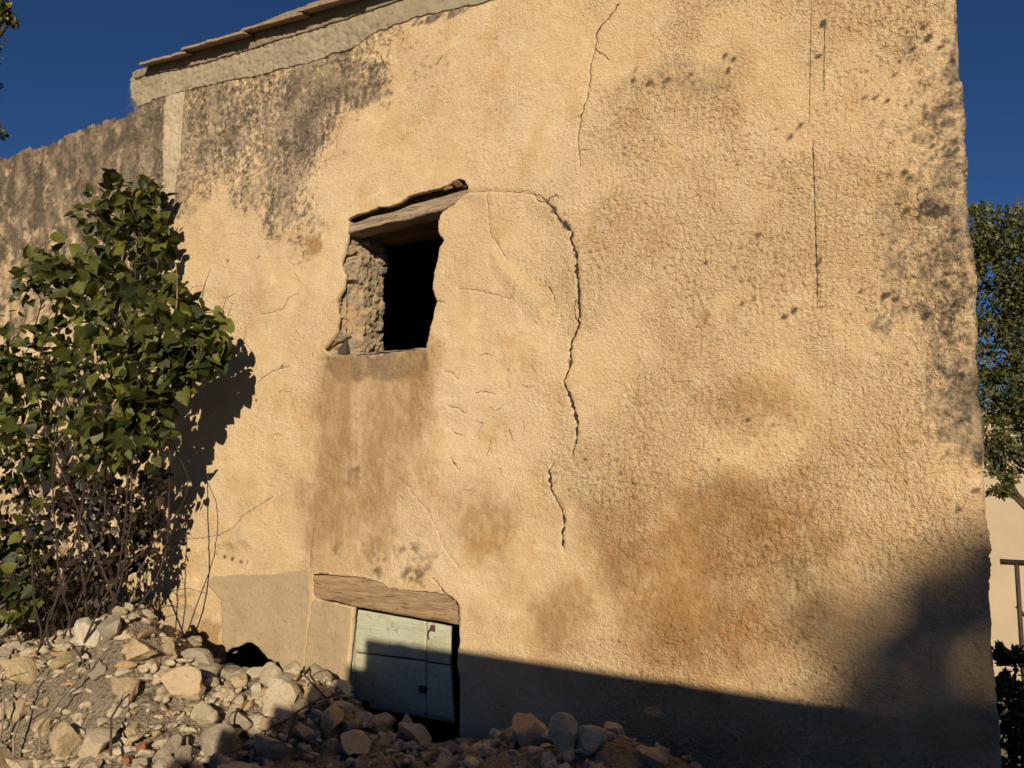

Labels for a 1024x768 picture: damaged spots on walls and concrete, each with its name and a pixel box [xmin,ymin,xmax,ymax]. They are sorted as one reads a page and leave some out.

crack [578,4,619,166]
crack [809,3,826,307]
damp [331,394,401,544]
damp [328,351,428,456]
crack [466,190,581,547]